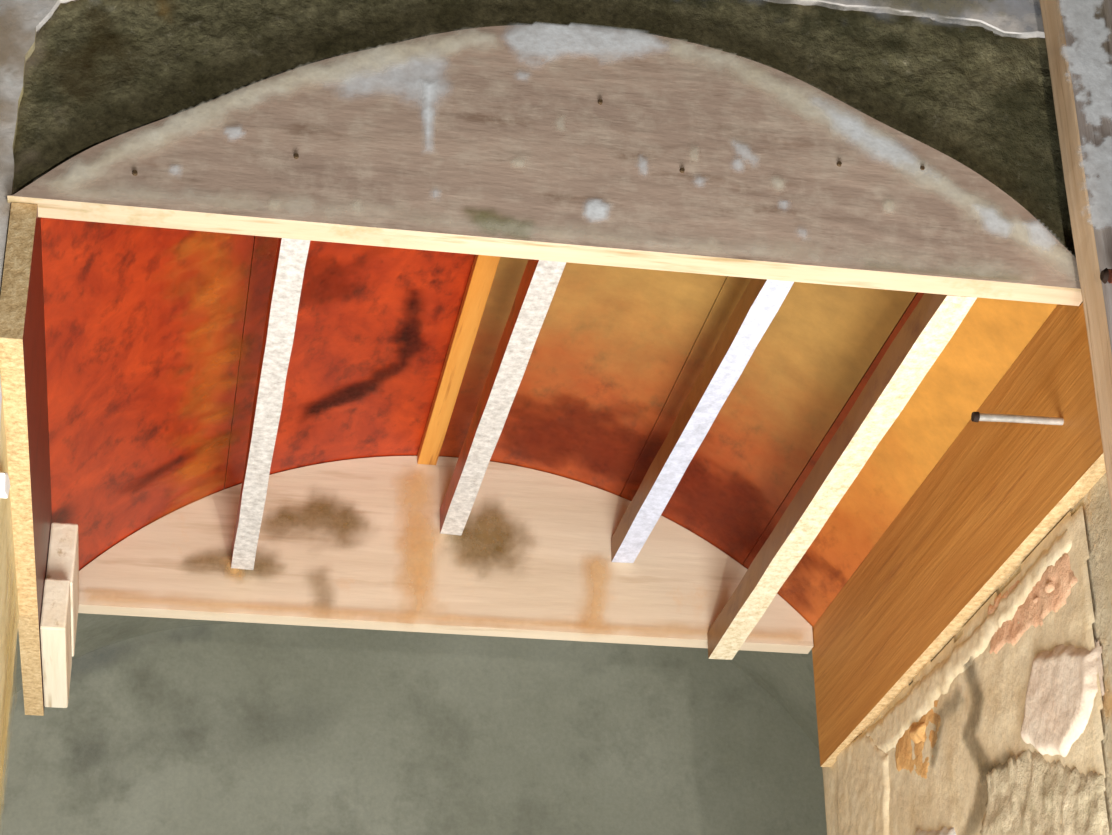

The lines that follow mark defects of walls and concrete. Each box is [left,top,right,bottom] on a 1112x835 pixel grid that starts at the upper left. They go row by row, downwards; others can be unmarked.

leakage [763,0,791,15]
leakage [821,3,859,22]
leakage [874,0,1041,48]